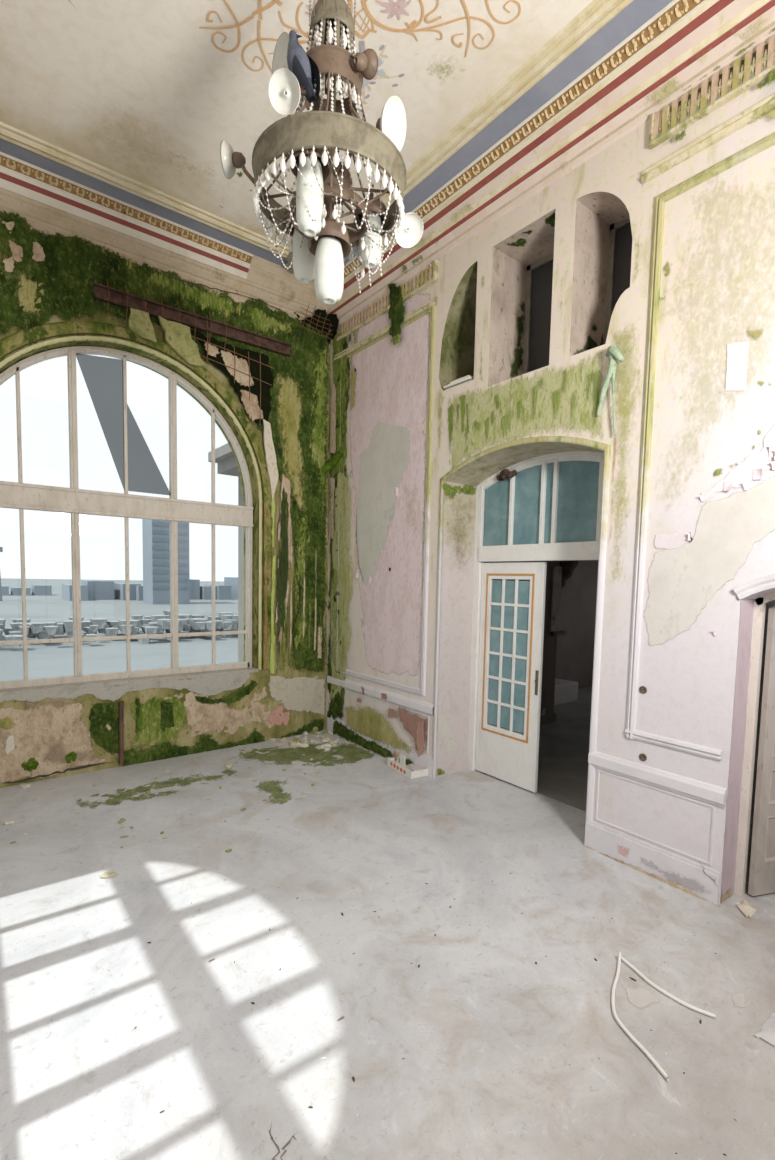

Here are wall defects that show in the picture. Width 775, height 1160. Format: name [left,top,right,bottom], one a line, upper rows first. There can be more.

flaking render [1,221,45,274]
spalling [296,314,339,344]
peeling [350,293,430,676]
flaking render [644,424,775,646]
leakage [274,474,335,673]
flaking render [0,702,106,784]
flaking render [164,675,325,738]
peeling [381,693,427,757]
crack [269,1121,297,1160]